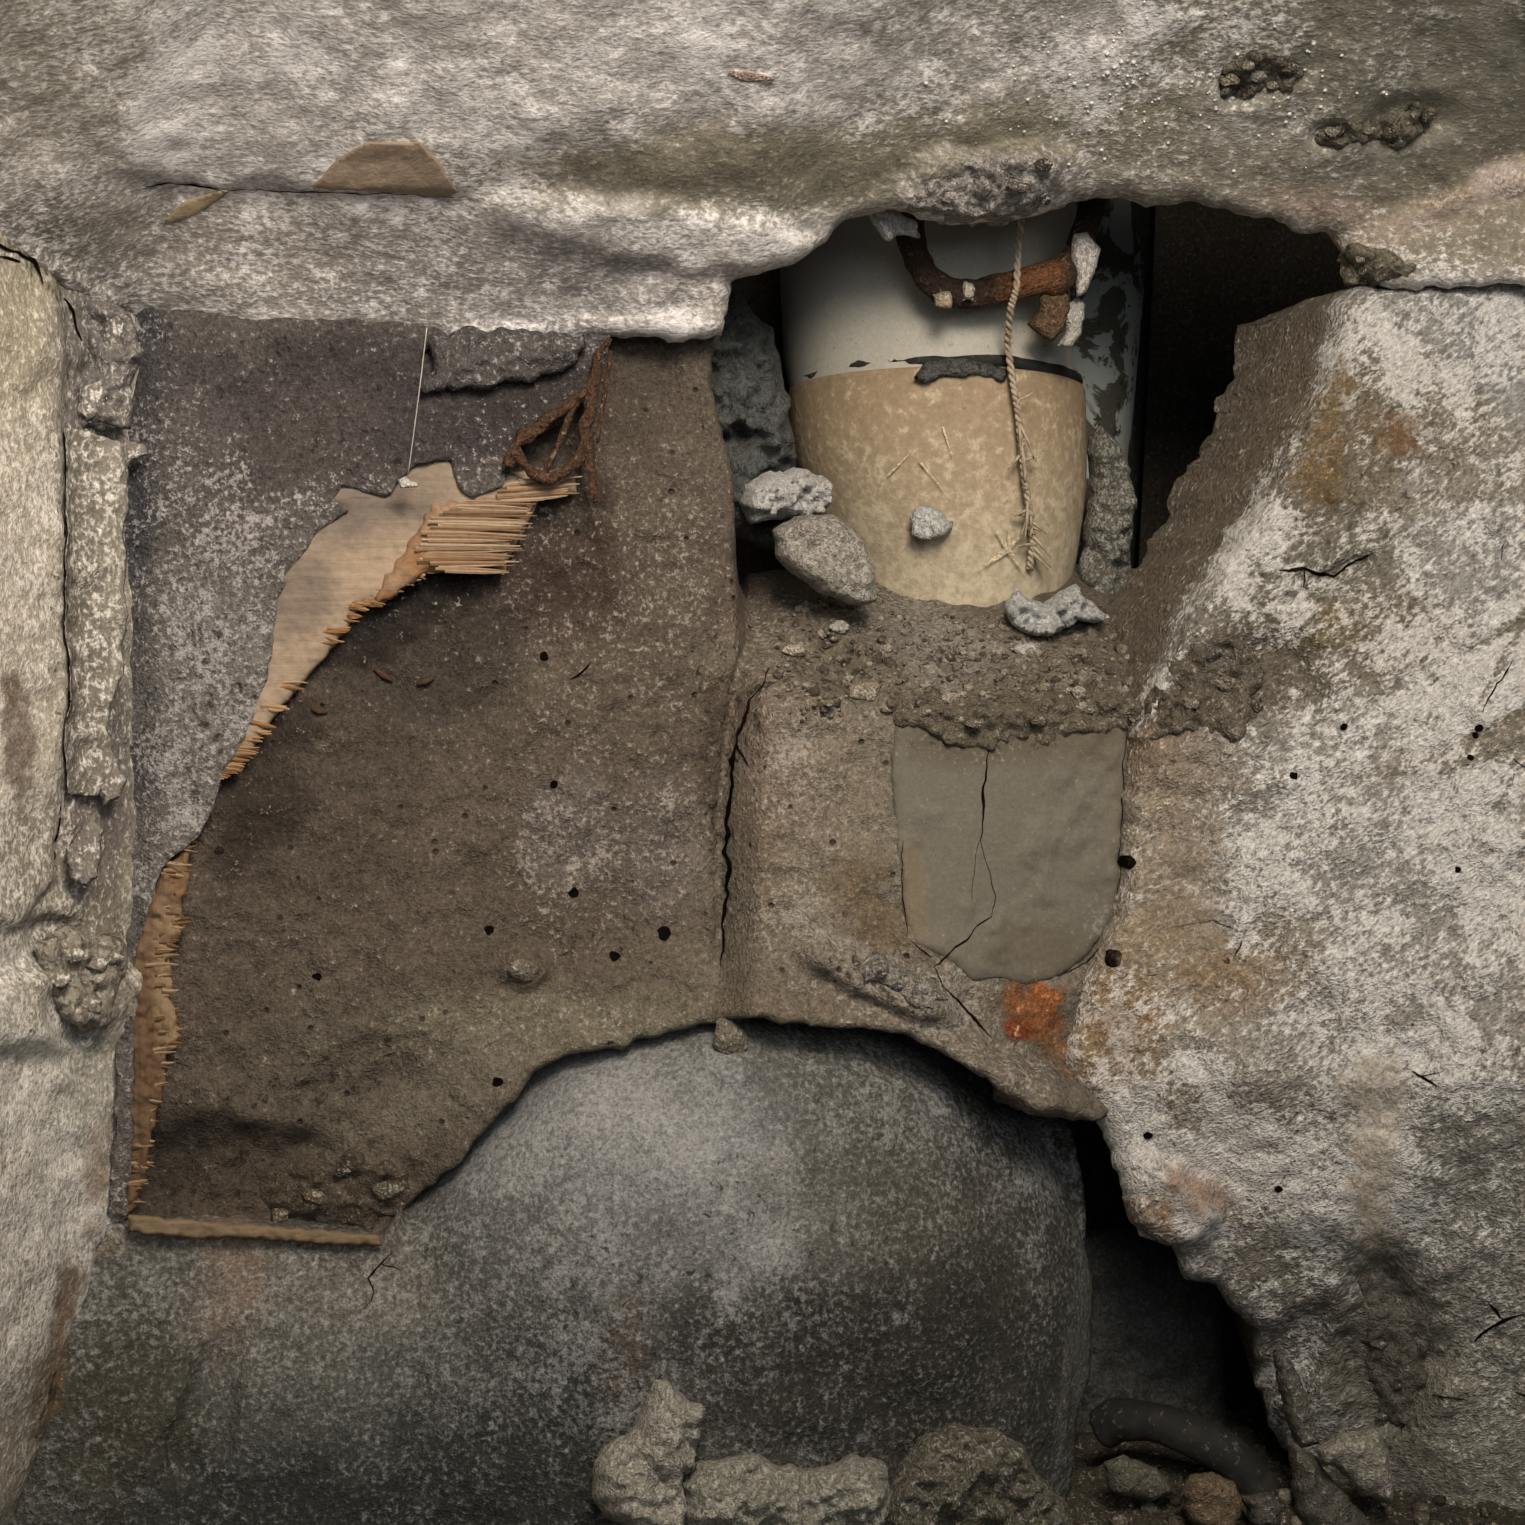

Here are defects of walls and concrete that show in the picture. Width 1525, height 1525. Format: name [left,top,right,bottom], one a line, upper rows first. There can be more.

spalling [906,150,1057,227]
corrosion [896,198,1106,348]
peeling [420,326,587,393]
crack [720,668,770,965]
spalling [657,926,671,941]
crack [901,750,996,1038]
corrosion [1003,980,1073,1075]
spalling [258,1146,411,1230]
crack [1474,1301,1525,1342]